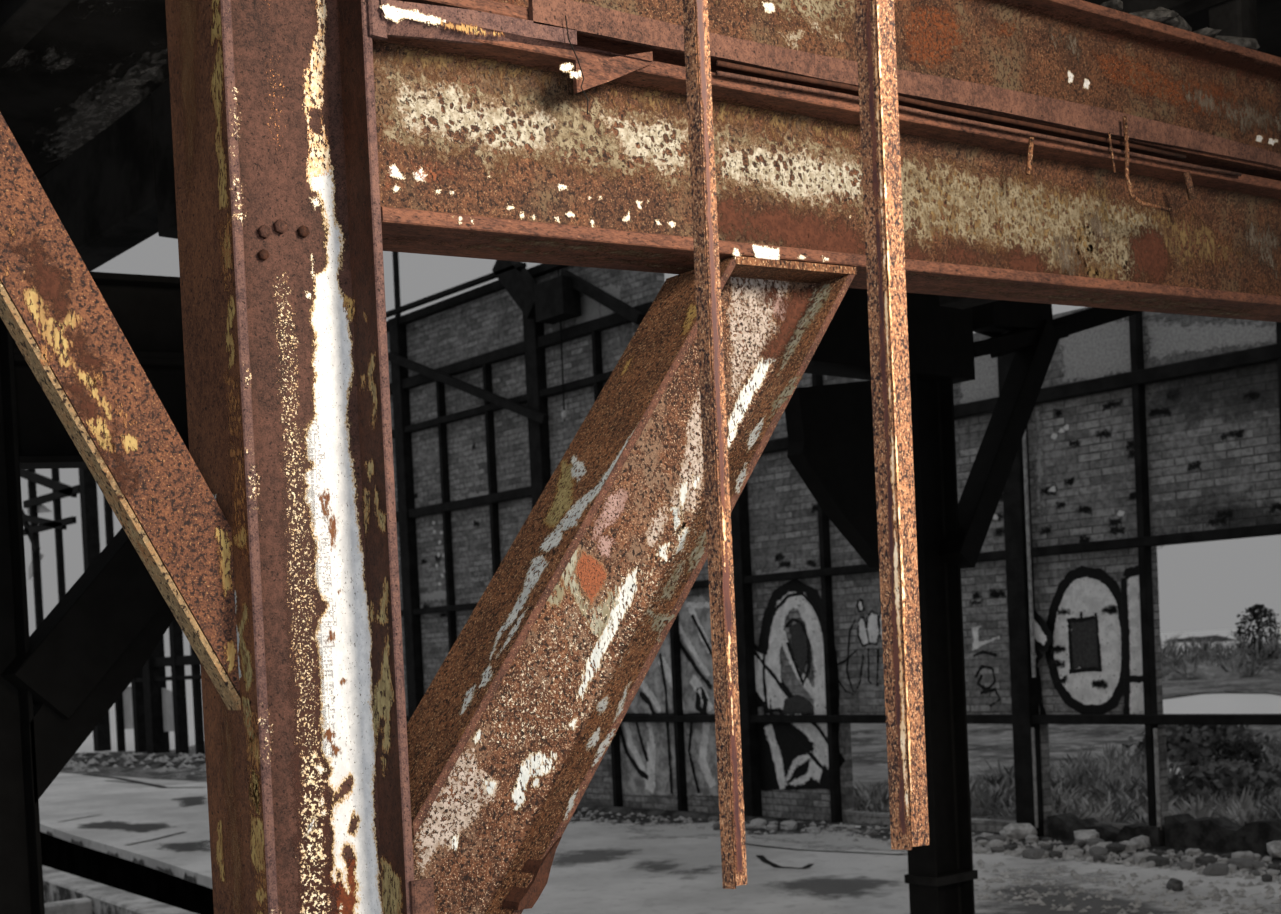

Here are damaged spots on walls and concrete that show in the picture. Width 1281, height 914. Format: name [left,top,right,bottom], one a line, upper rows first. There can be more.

peeling [380,3,503,39]
rust [990,0,1281,119]
rust [10,229,139,500]
peeling [23,285,155,475]
peeling [273,0,403,914]
peeling [732,244,780,260]
peeling [725,277,832,494]
rust [697,0,907,873]
rust [904,239,1059,274]
rust [1120,216,1177,284]
rust [279,449,359,914]
peeling [413,386,727,877]